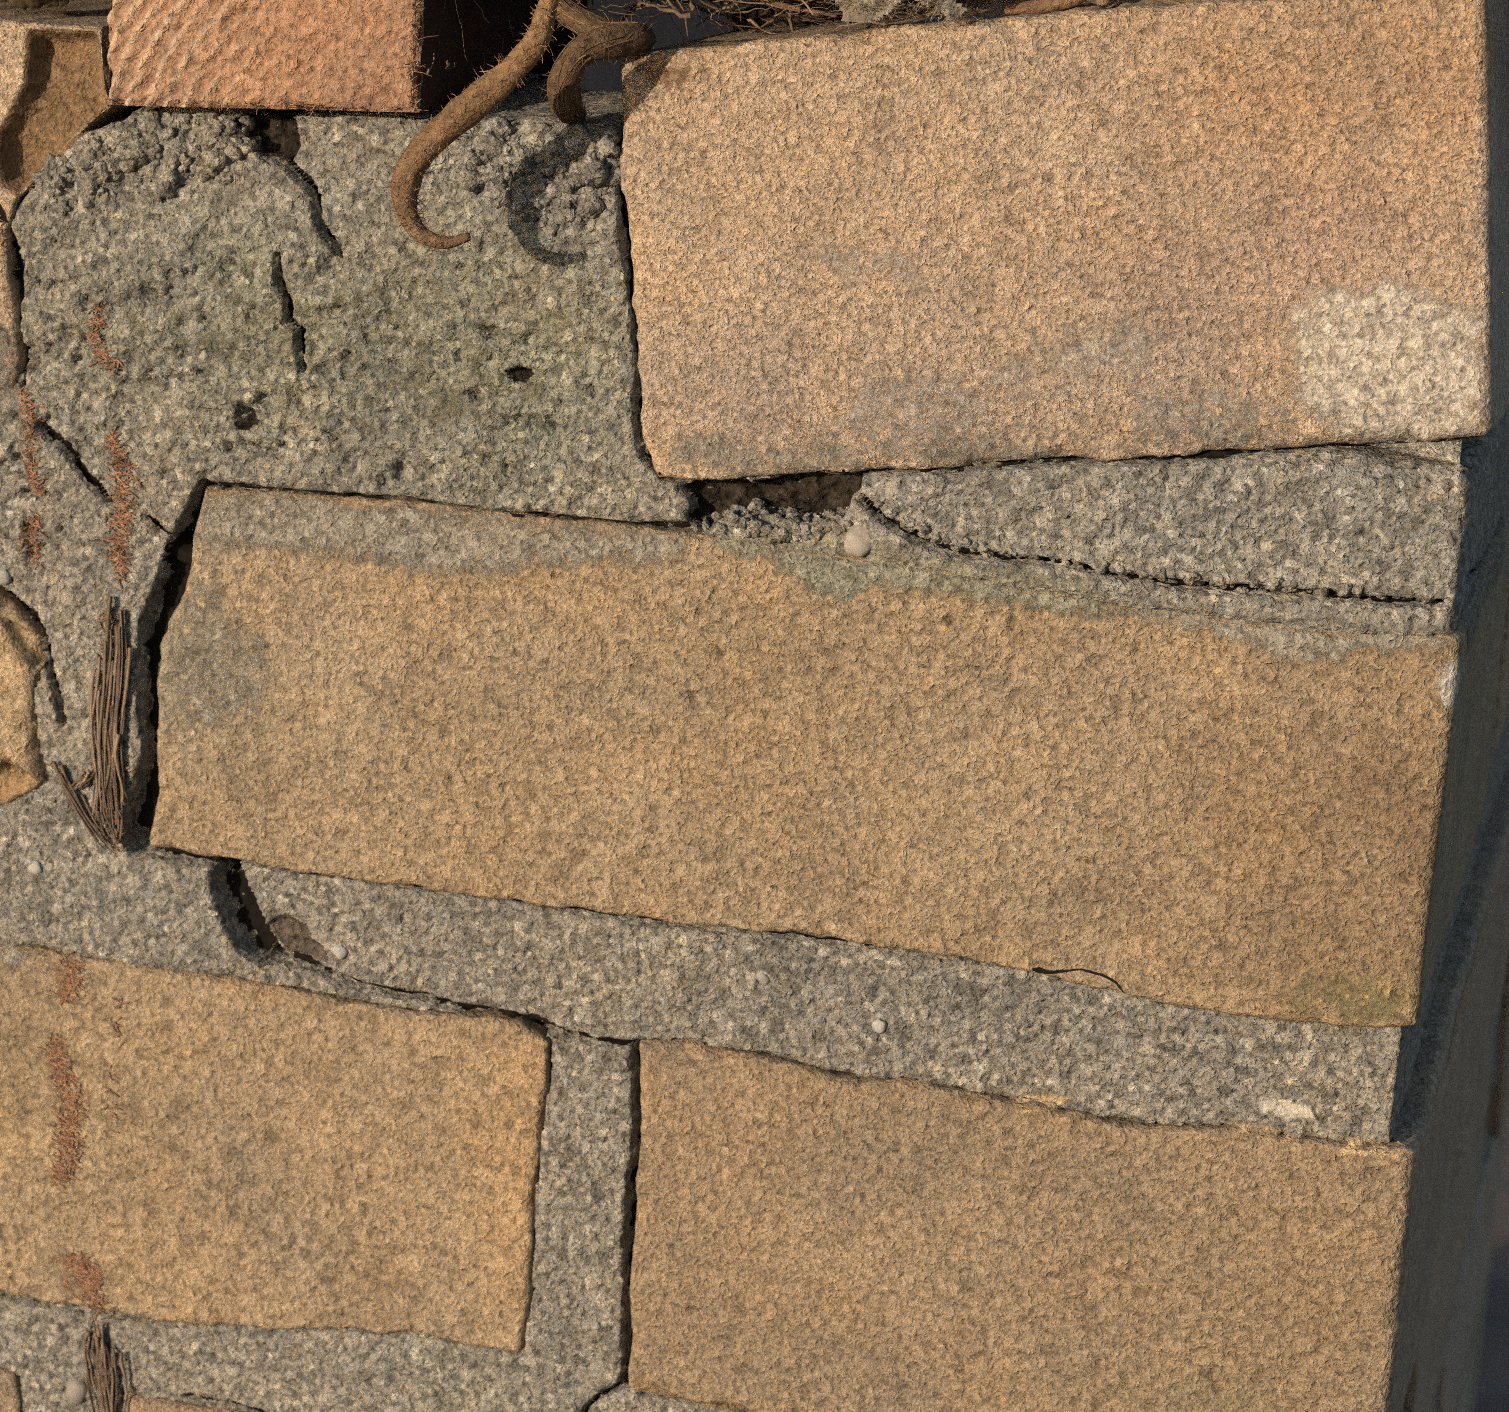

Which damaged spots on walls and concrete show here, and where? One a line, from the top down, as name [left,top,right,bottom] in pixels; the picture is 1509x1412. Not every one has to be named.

spalling [0,28,145,195]
crack [294,165,336,240]
crack [283,281,307,367]
crack [620,187,639,356]
crack [46,424,109,496]
crack [865,456,1270,592]
crack [1132,447,1300,460]
crack [1307,589,1443,603]
spalling [0,646,41,806]
crack [137,482,691,1060]
crack [745,930,872,947]
crack [628,1131,641,1287]